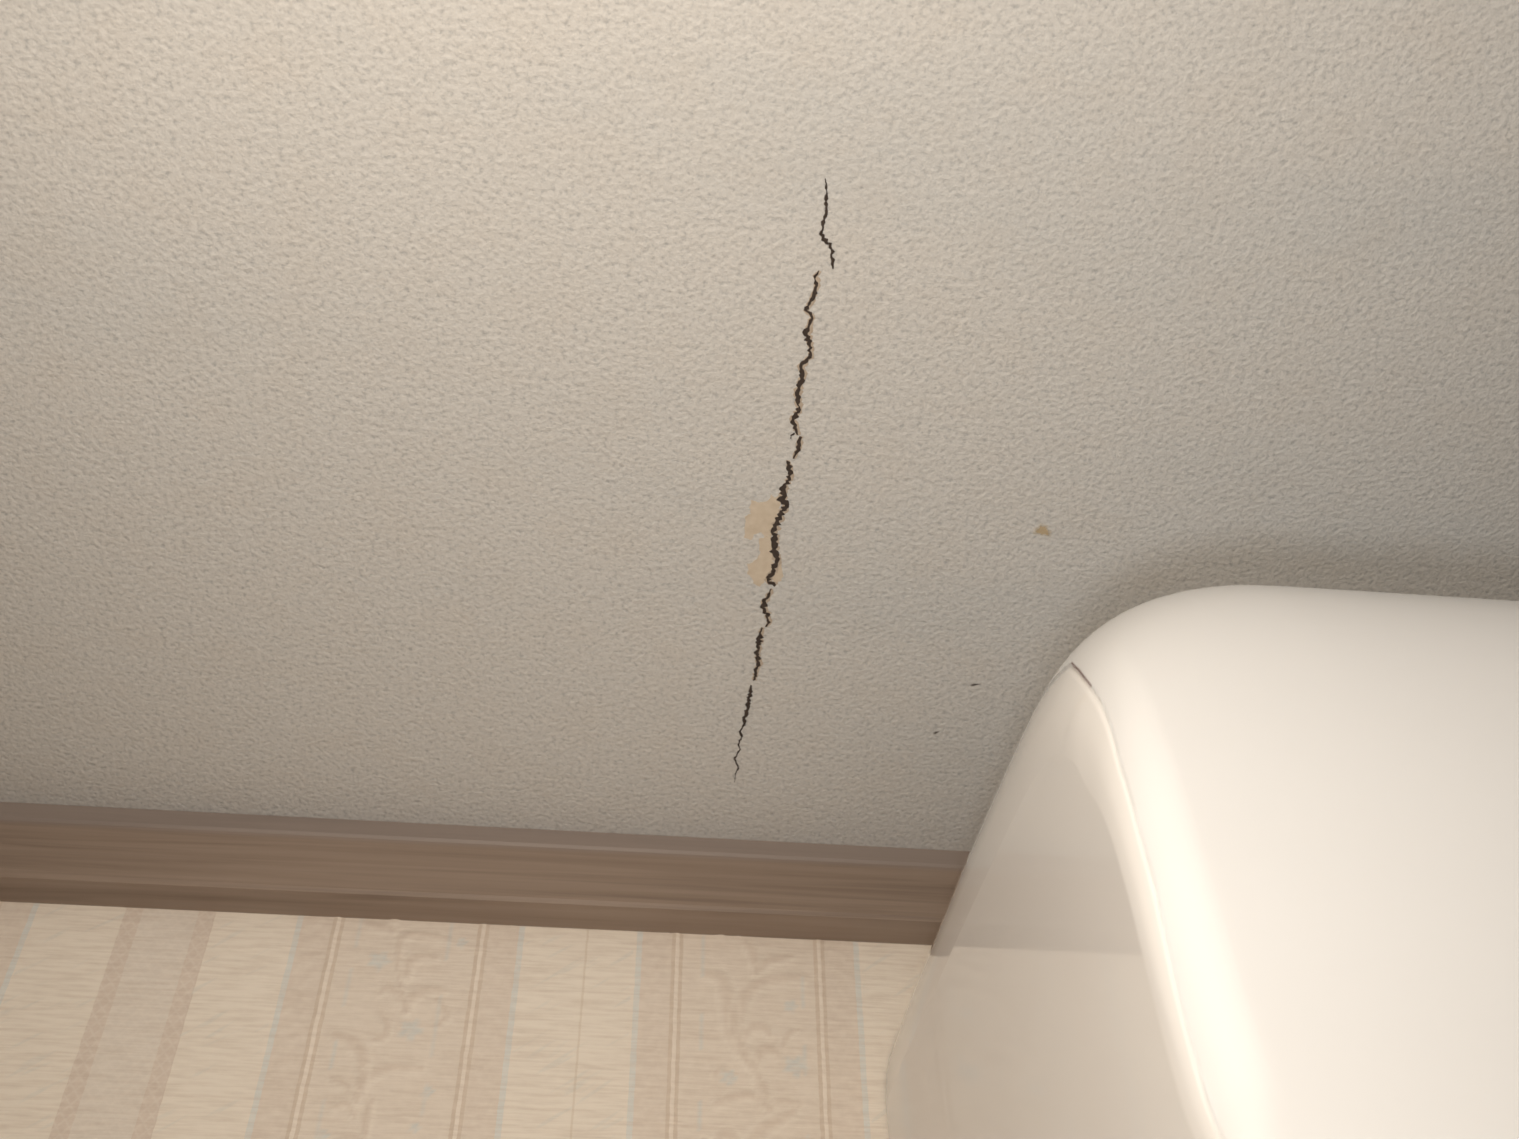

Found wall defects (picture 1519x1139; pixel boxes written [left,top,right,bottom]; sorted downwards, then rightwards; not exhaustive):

peeling [744,495,783,587]
crack [734,179,835,783]